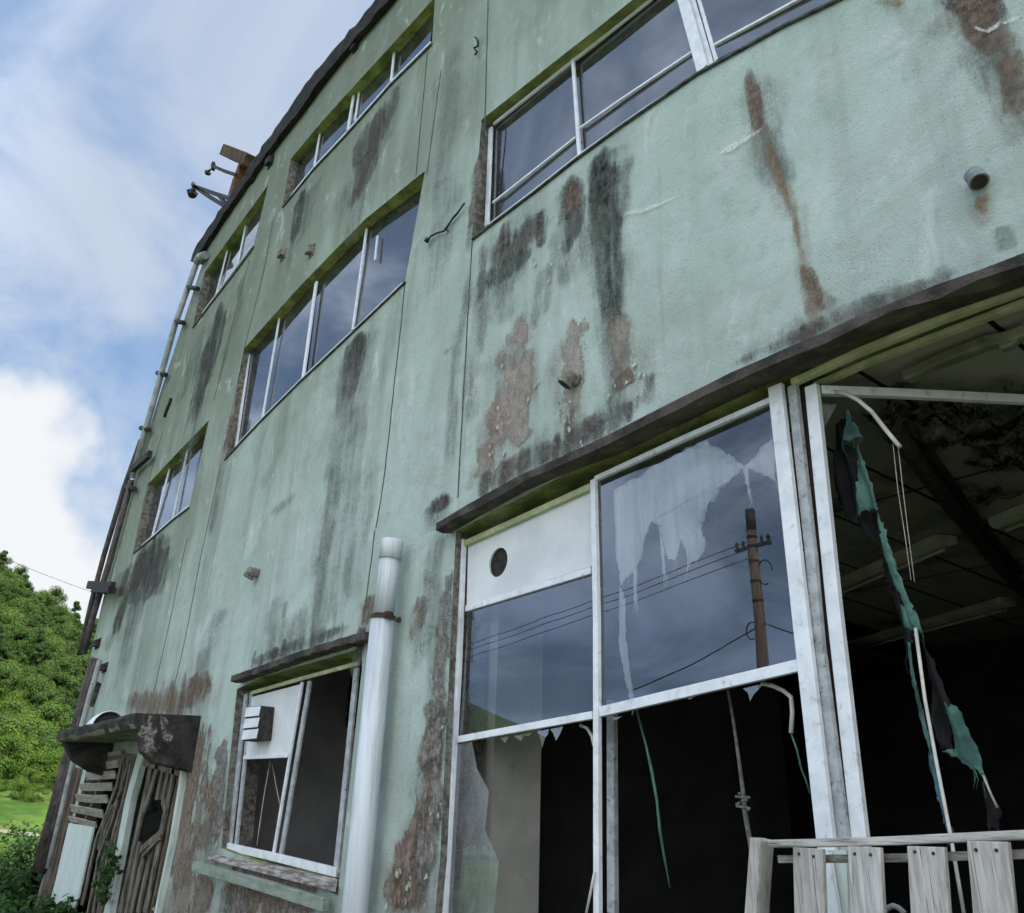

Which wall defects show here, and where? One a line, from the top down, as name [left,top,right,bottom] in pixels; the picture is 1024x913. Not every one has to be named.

leakage [344,89,397,206]
leakage [463,212,545,344]
leakage [561,146,624,323]
corrosion [746,72,829,310]
leakage [182,305,226,451]
peeling [471,300,539,477]
peeling [559,316,589,447]
peeling [607,313,646,397]
leakage [110,538,169,660]
spalling [138,715,173,756]
spalling [383,572,453,911]
peeling [163,725,316,913]